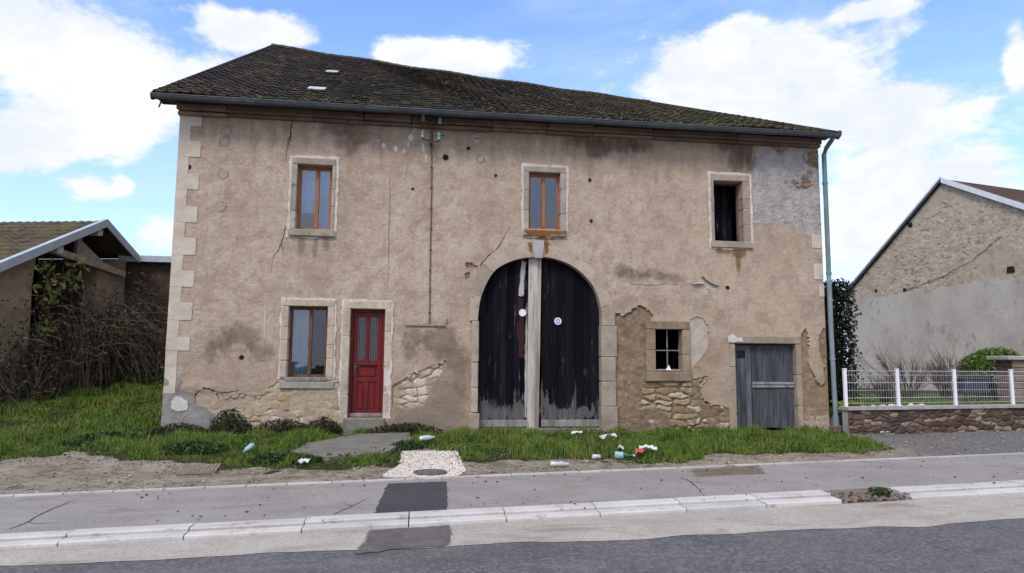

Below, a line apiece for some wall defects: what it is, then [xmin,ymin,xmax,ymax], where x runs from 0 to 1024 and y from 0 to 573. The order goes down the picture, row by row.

flaking render [750,146,821,235]
spalling [195,379,340,434]
spalling [391,360,448,408]
spalling [615,305,730,432]
flaking render [801,329,830,431]